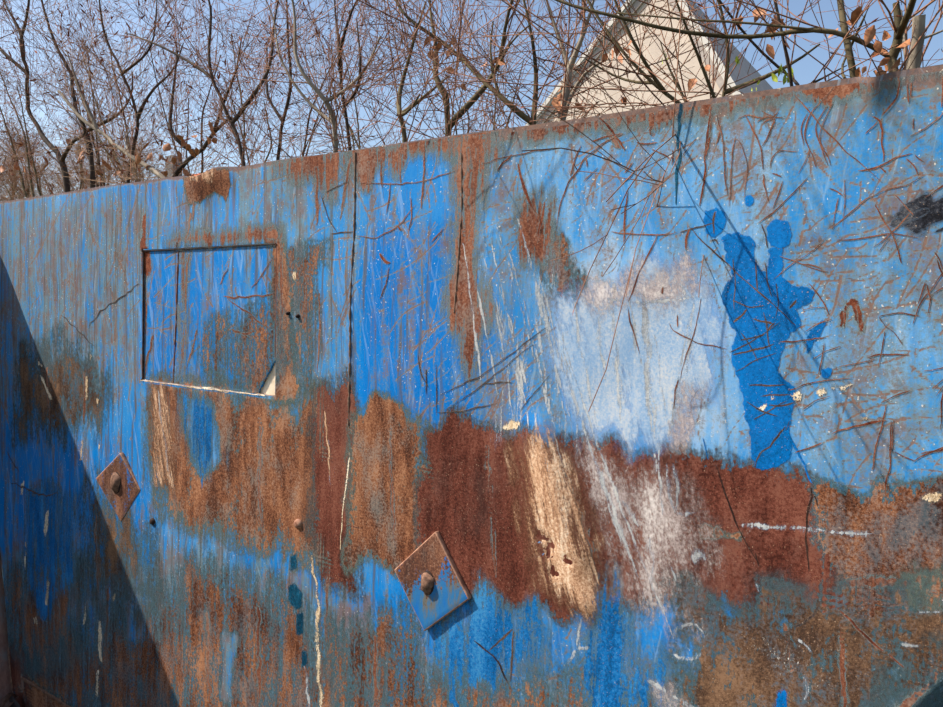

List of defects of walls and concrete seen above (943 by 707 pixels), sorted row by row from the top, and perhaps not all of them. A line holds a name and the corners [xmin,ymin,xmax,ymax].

corrosion [4,164,943,707]
corrosion [271,71,943,383]